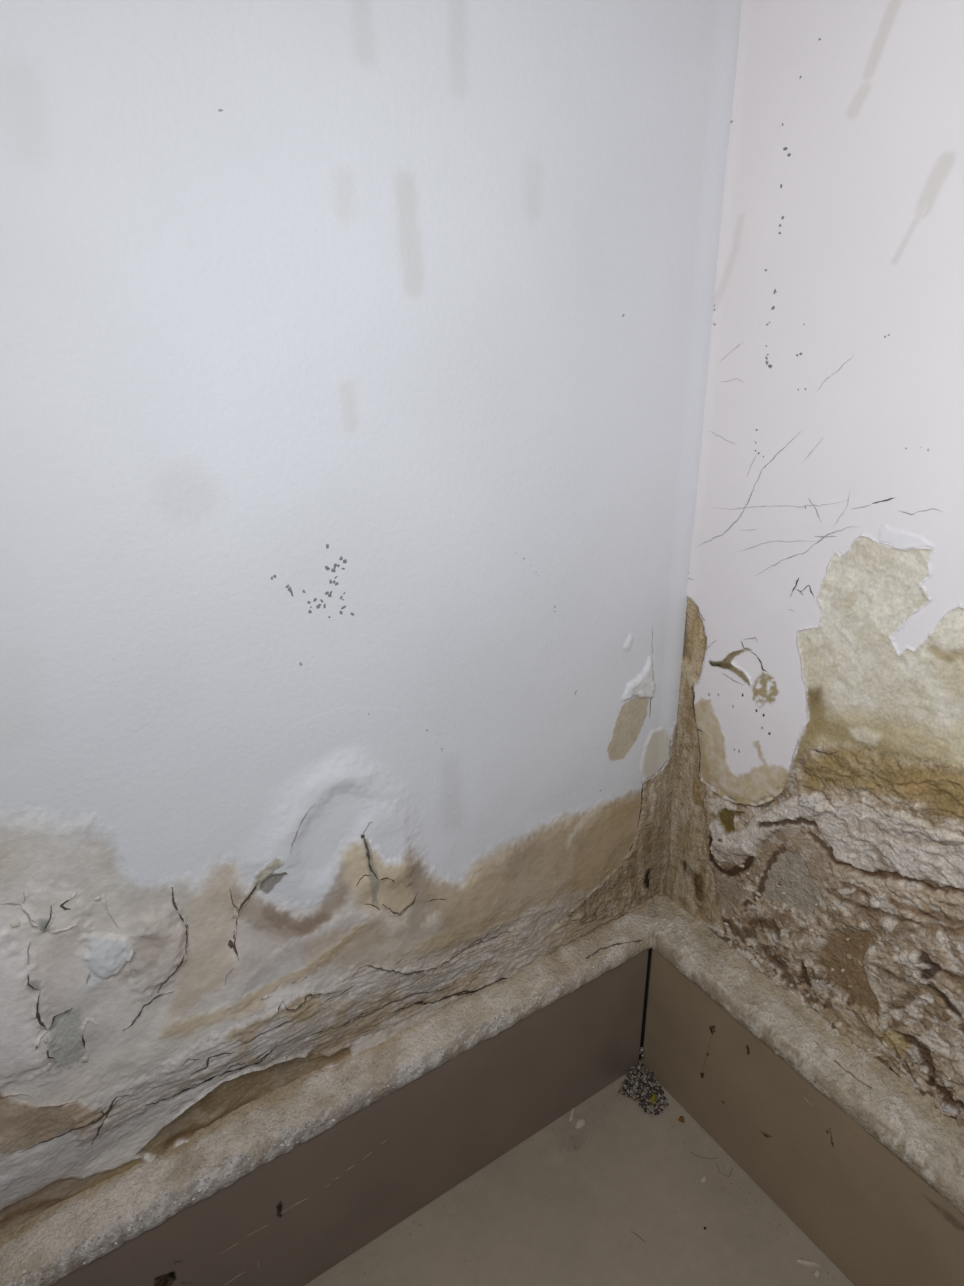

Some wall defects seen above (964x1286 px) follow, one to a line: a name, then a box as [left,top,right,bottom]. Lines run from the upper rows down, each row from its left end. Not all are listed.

leakage [271,544,354,618]
crack [700,432,942,611]
crack [123,886,190,1031]
crack [290,806,313,853]
leakage [0,784,642,1106]
crack [357,821,447,917]
spalling [0,522,964,1234]
crack [20,924,517,1153]
leakage [0,1064,257,1211]